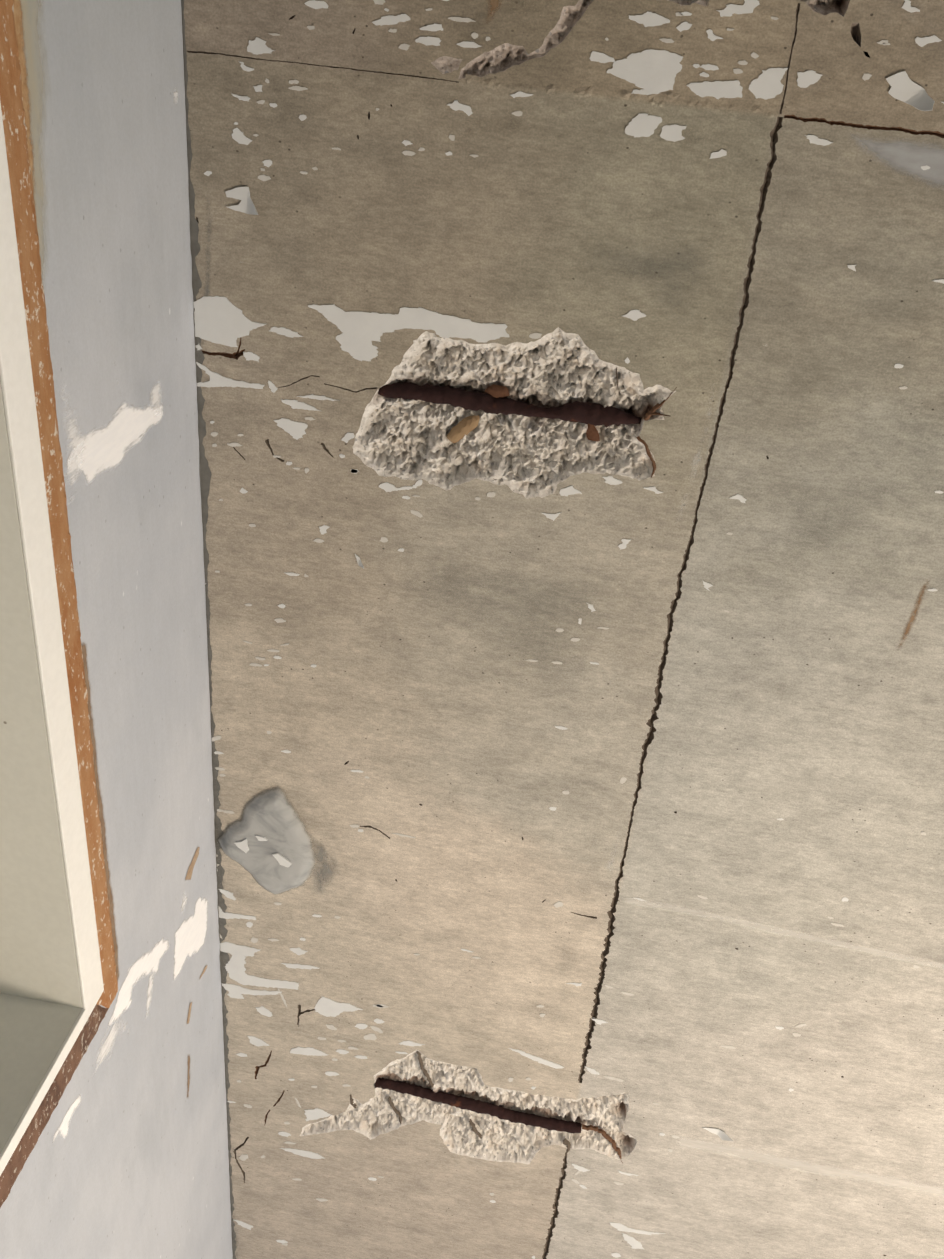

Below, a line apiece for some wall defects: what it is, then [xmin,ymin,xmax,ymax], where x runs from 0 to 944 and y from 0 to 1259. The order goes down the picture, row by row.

spalling [372,0,594,79]
peeling [589,0,822,100]
spalling [800,0,890,58]
peeling [862,71,944,111]
peeling [901,0,920,13]
peeling [915,35,942,47]
spalling [308,304,677,518]
crack [571,3,800,1083]
spalling [278,996,639,1189]
crack [542,1156,568,1259]